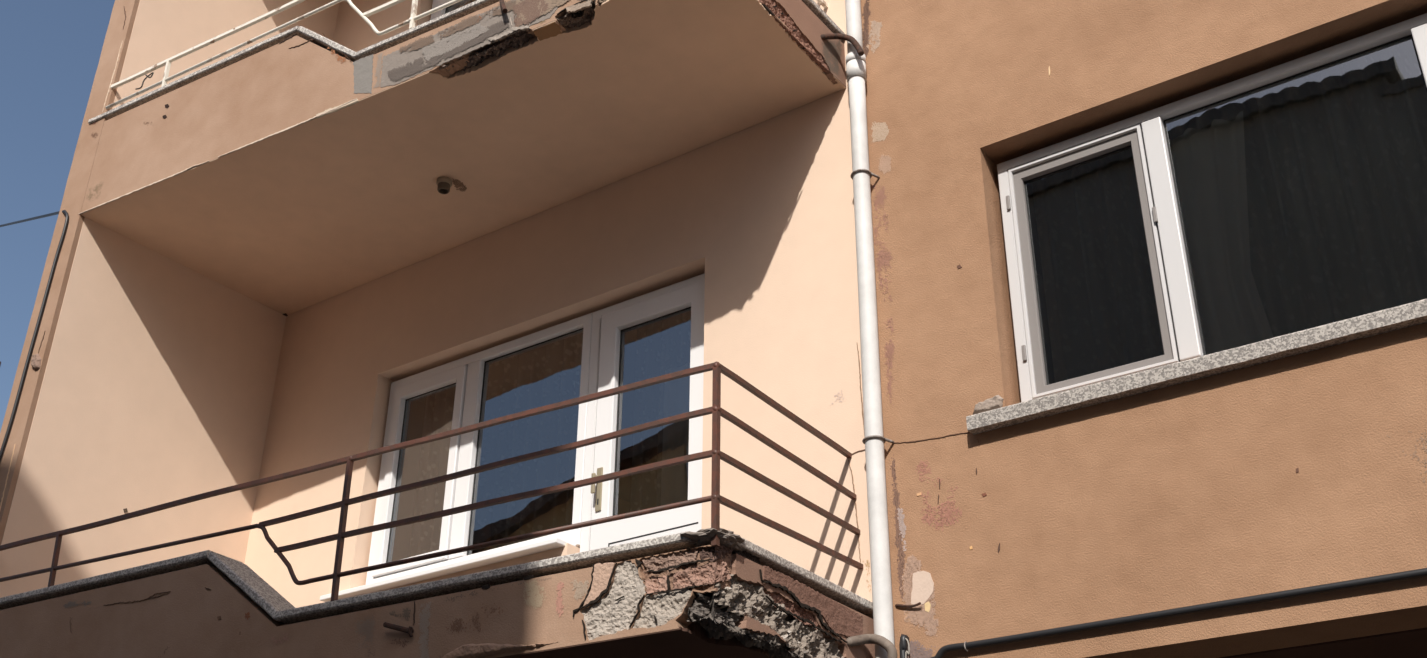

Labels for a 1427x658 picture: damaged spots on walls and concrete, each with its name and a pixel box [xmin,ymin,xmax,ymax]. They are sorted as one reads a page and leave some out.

spalling [439,0,601,72]
flaking render [759,0,829,72]
peeling [571,562,615,606]
crack [573,559,713,639]
spalling [642,544,863,658]
crack [759,569,847,643]
peeling [897,508,939,636]